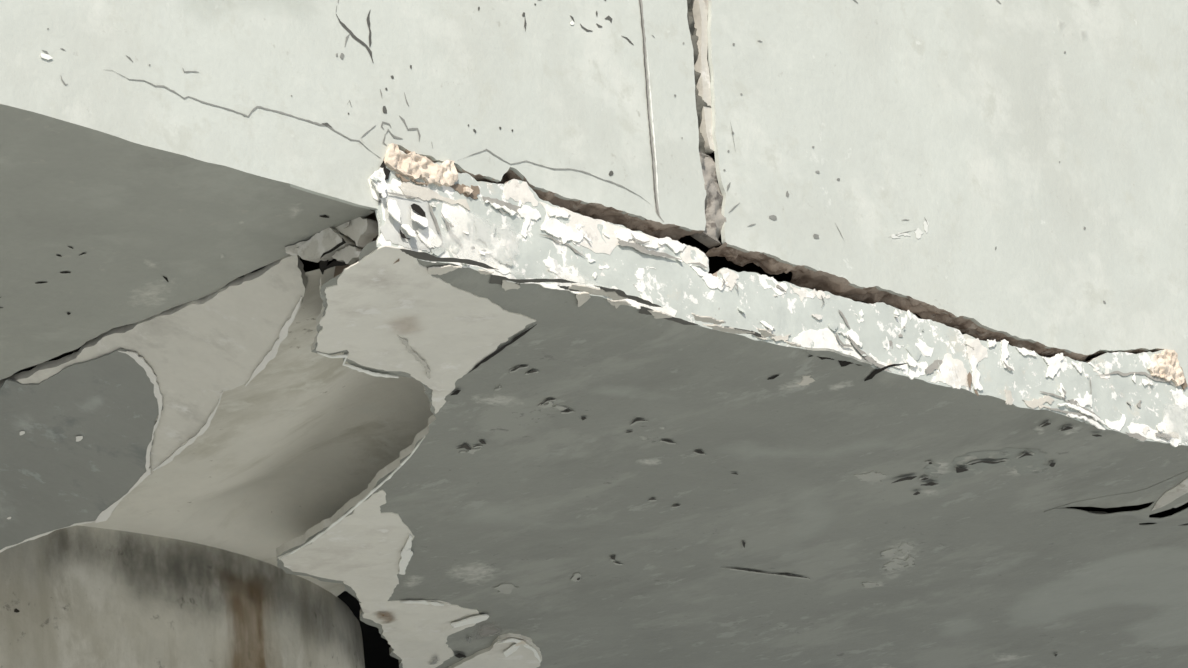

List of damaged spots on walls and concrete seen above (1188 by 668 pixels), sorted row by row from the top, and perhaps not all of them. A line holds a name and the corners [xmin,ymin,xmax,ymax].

crack [2,335,100,380]
peeling [0,143,868,668]
crack [112,0,1177,394]
spalling [852,309,1188,499]